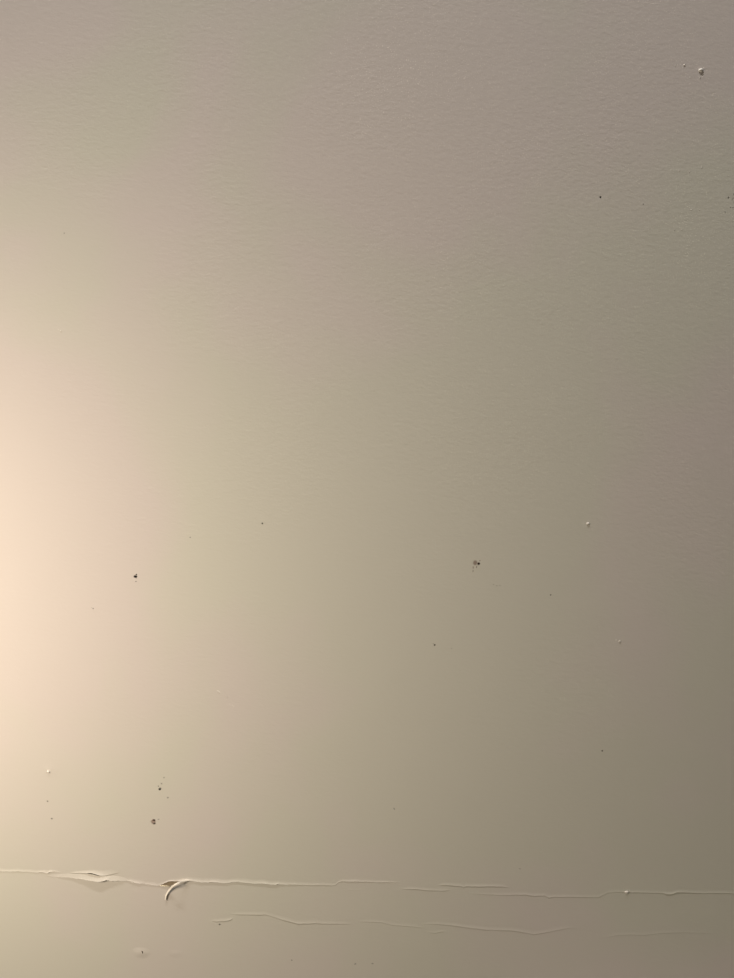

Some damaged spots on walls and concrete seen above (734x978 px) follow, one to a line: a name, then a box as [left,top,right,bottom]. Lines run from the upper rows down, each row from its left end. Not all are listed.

crack [0,868,734,900]